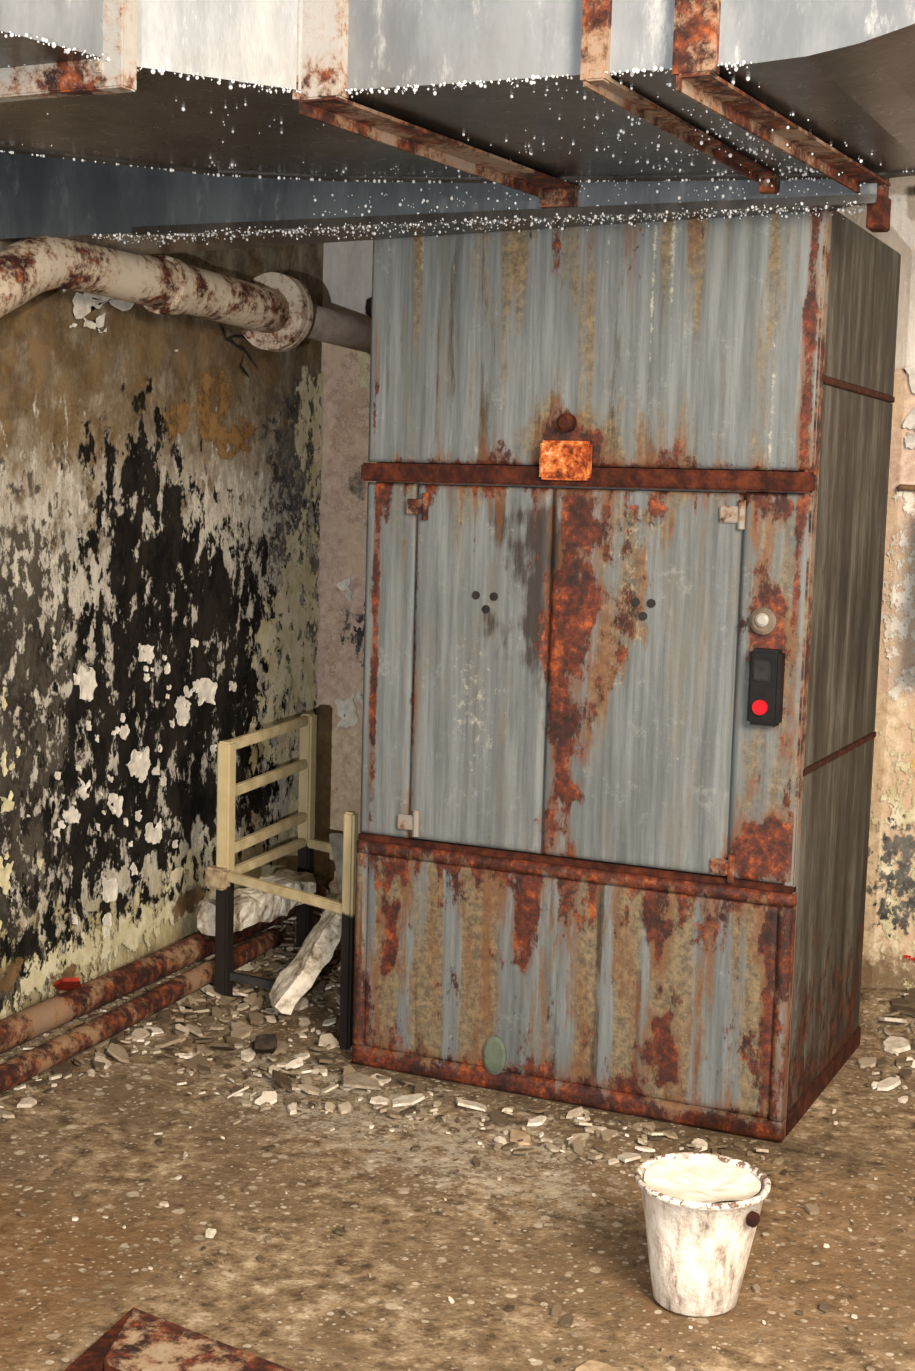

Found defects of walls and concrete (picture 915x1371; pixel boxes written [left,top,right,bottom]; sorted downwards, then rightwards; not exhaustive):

peeling [902,365,915,449]
water stain [0,289,322,1012]
water stain [340,602,365,667]
rust [172,885,206,923]
water stain [866,814,915,938]
rust [50,963,77,994]